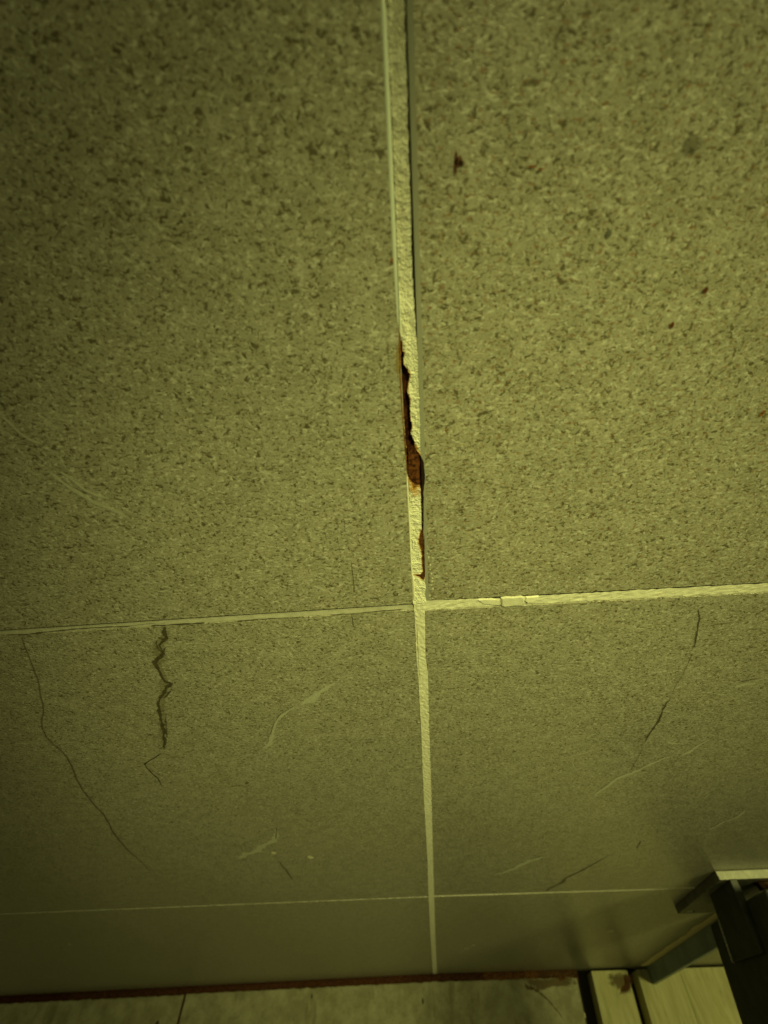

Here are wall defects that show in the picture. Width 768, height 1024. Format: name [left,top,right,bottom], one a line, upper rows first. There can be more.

peeling [385,0,426,604]
corrosion [408,448,425,568]
crack [335,608,402,616]
crack [8,622,204,787]
crack [646,700,670,740]